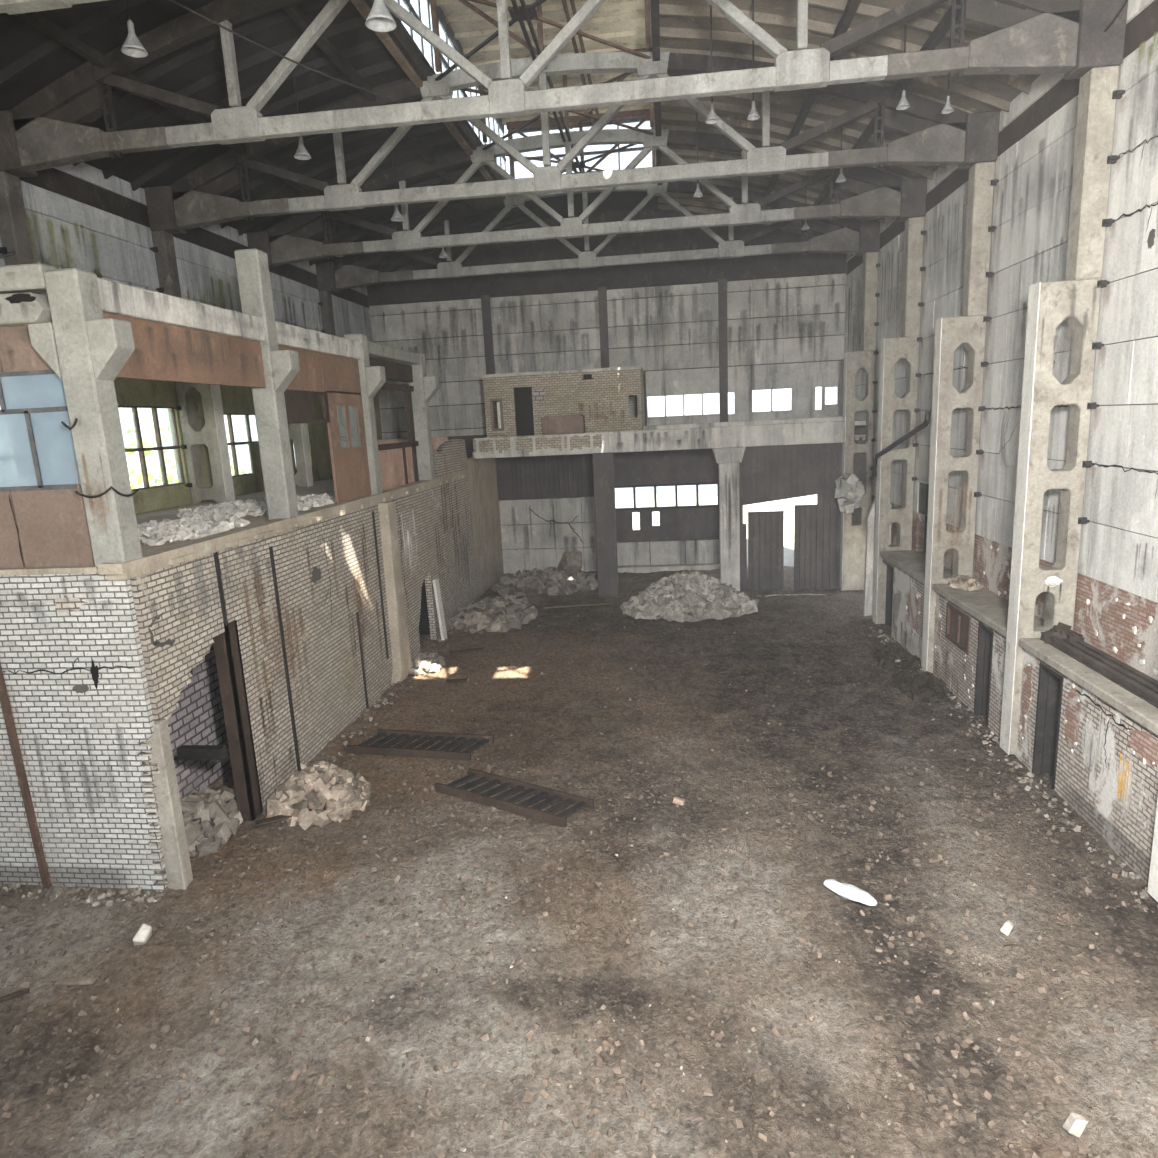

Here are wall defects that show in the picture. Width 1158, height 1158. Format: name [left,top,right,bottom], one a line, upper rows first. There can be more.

peeling [1083,594,1158,675]
peeling [1063,684,1082,753]
peeling [1127,730,1158,768]